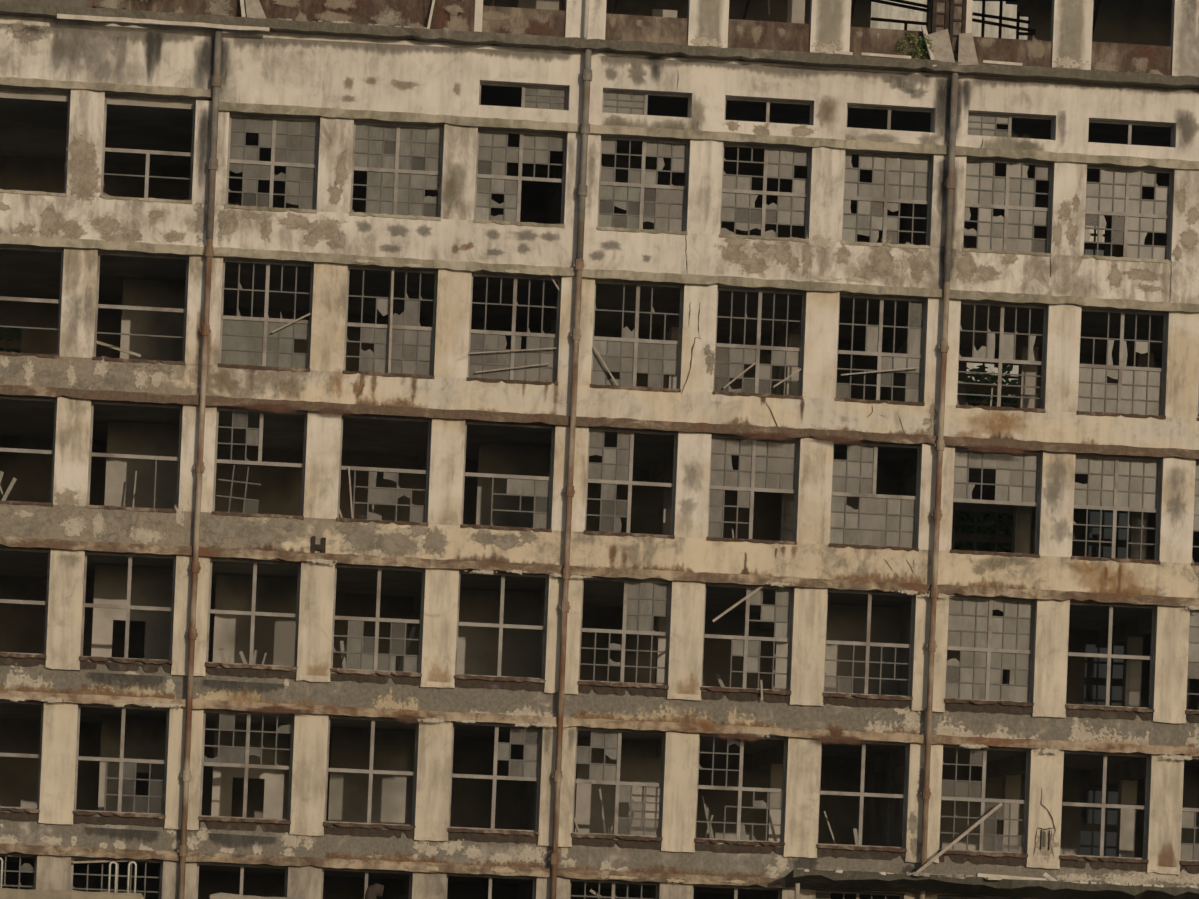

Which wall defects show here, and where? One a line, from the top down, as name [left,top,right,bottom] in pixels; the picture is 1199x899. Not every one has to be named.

leakage [602,0,1199,144]
peeling [165,203,346,249]
peeling [722,236,815,275]
crack [681,302,702,394]
rust [238,374,421,415]
peeling [306,521,447,564]
rust [458,556,551,565]
rust [599,546,693,572]
rust [836,574,923,584]
rust [956,580,1035,589]
peeling [372,687,778,738]
peeling [367,839,577,874]